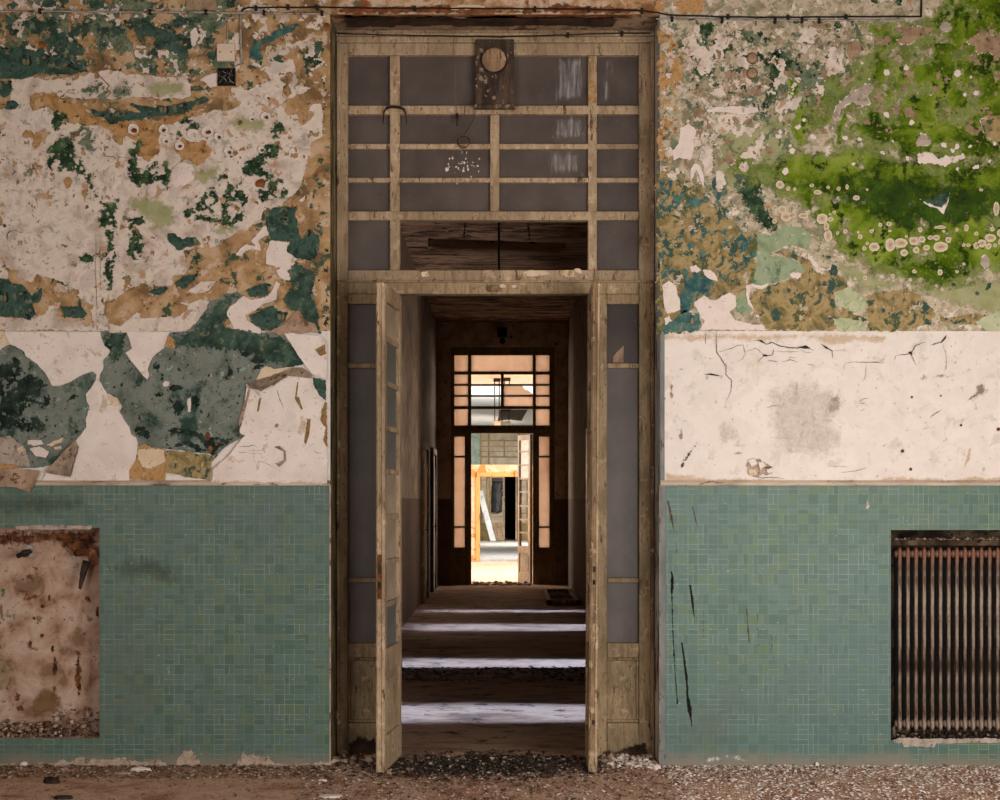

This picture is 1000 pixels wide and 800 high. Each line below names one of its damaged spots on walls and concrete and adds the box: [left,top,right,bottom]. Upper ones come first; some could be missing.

flaking render [653,0,1000,335]
peeling [0,0,328,492]
crack [705,332,947,402]
corrosion [0,530,97,556]
corrosion [14,690,59,715]